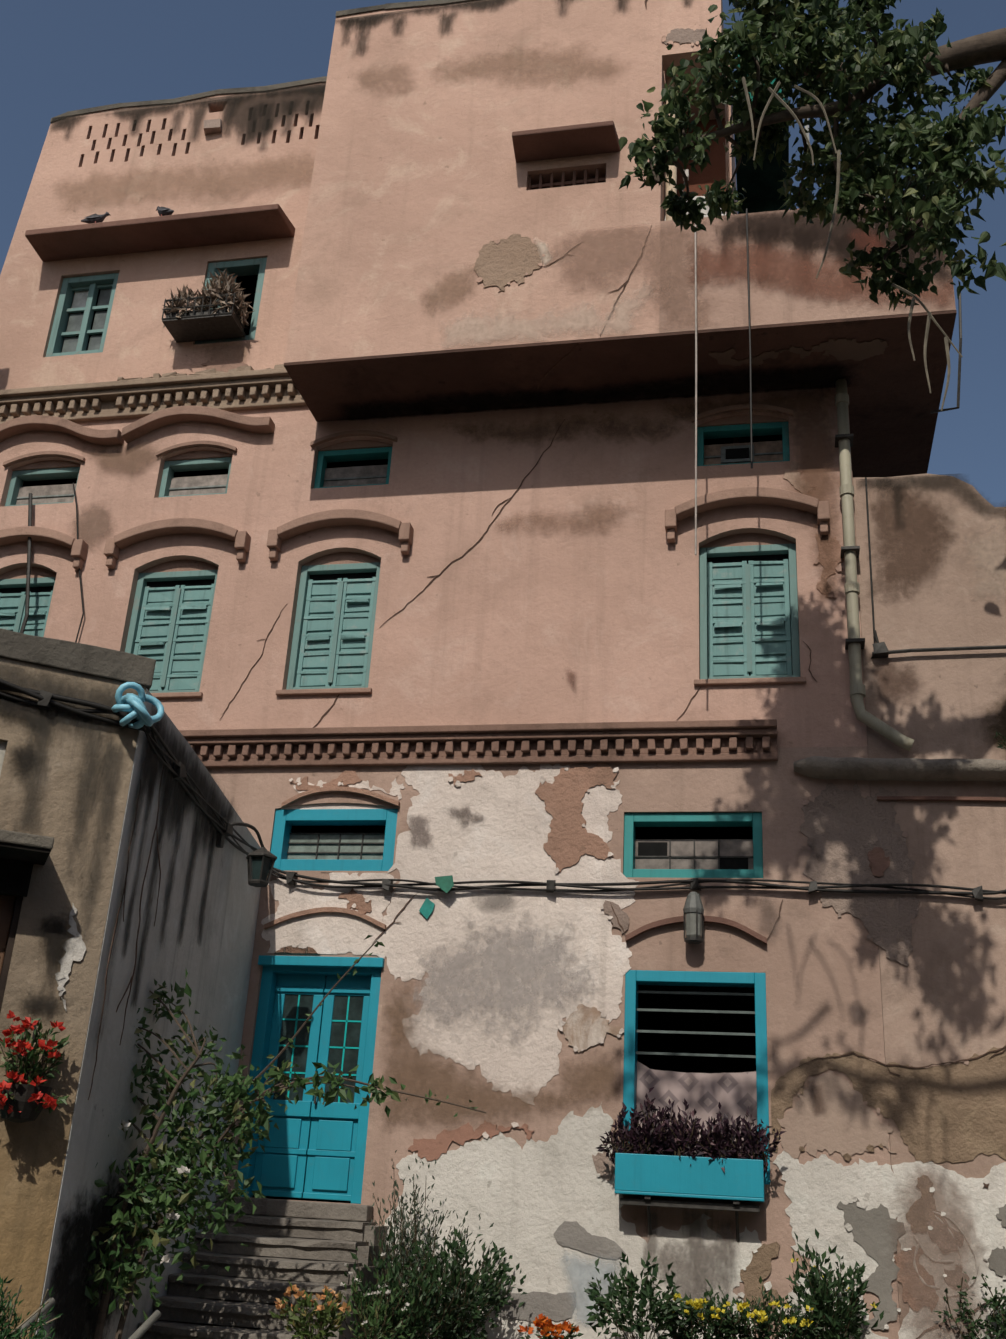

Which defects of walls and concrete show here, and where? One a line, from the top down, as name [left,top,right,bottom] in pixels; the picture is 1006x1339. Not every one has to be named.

leakage [111,83,326,141]
flaking render [474,234,545,293]
crack [600,225,652,336]
leakage [447,205,953,345]
crack [379,419,565,628]
leakage [862,474,1005,590]
crack [220,604,287,719]
leakage [112,710,233,1004]
peeling [535,763,619,874]
peeling [797,781,920,966]
flaking render [55,904,86,1010]
peeling [771,1042,1006,1339]